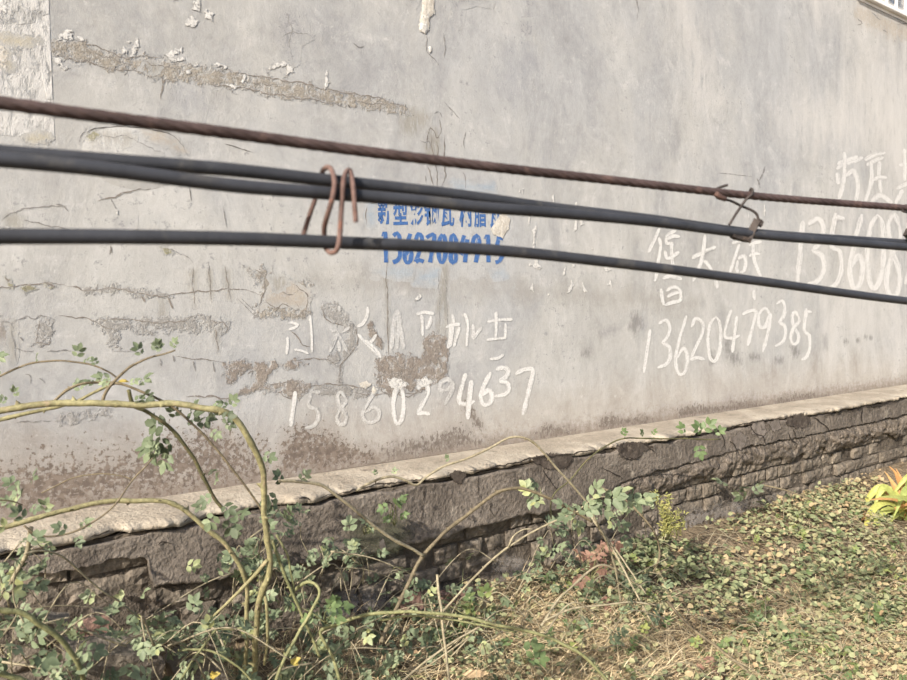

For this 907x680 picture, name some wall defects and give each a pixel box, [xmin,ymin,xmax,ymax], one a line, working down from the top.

flaking render [0,0,414,118]
flaking render [418,0,446,65]
peeling [0,110,55,137]
crack [0,204,68,229]
crack [99,185,164,214]
flaking render [58,263,451,402]
leakage [0,392,512,520]